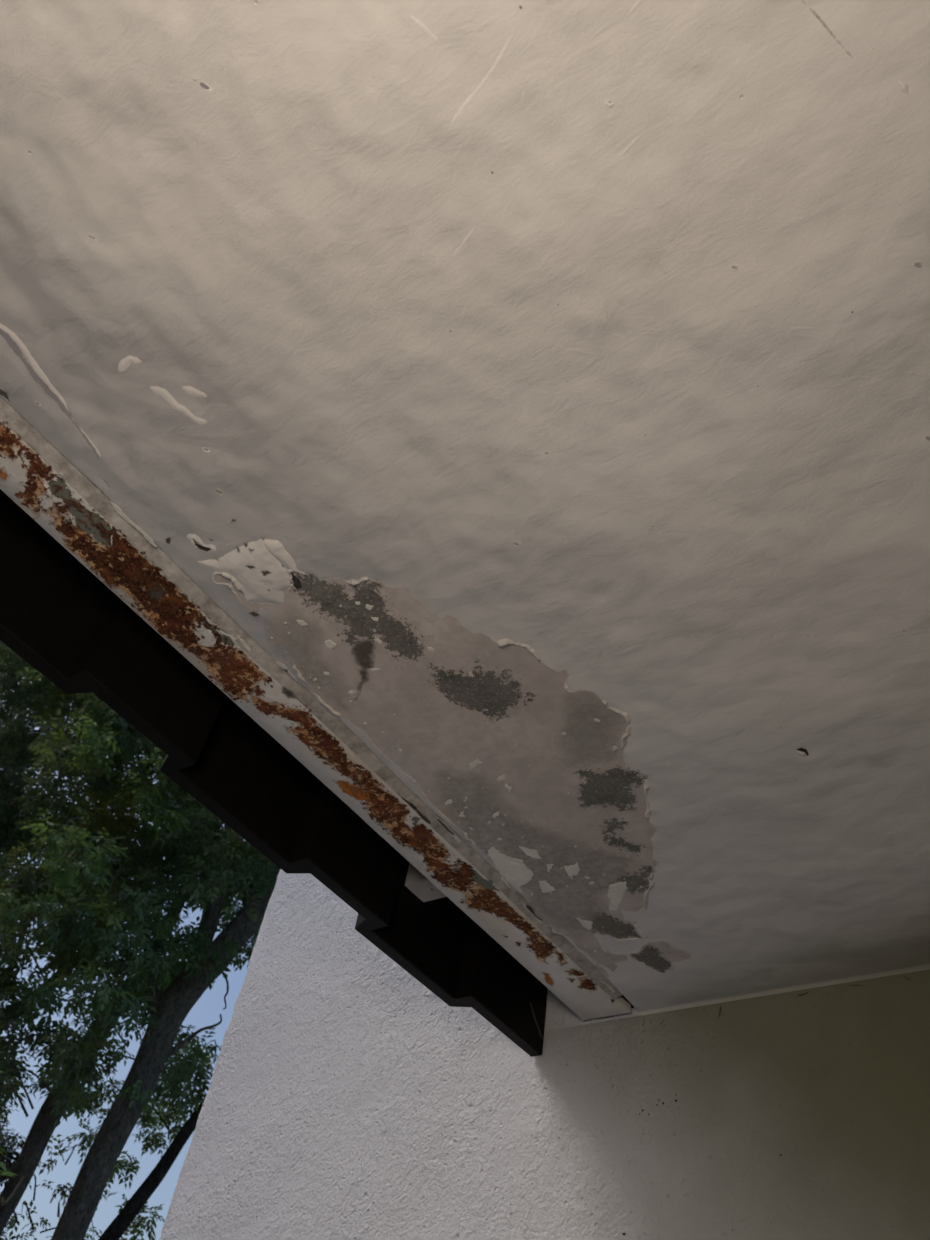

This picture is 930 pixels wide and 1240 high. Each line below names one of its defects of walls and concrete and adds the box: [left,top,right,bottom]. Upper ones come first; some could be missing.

crack [0,323,101,457]
spalling [187,534,216,552]
corrosion [0,421,597,993]
peeling [212,569,691,973]